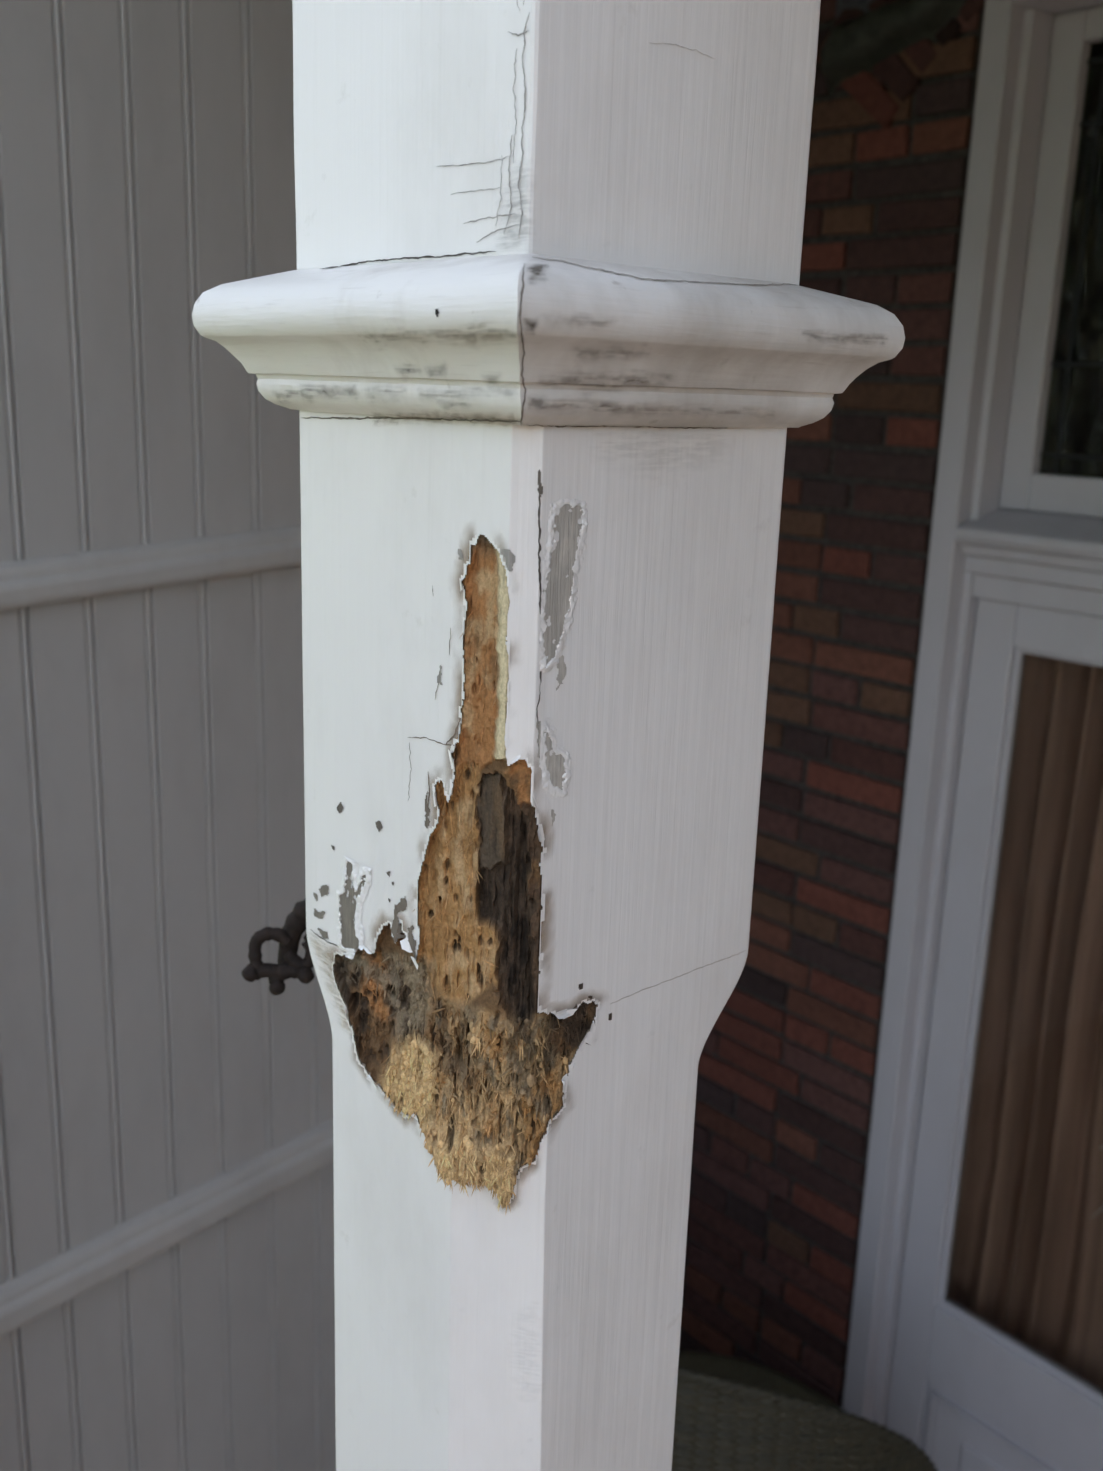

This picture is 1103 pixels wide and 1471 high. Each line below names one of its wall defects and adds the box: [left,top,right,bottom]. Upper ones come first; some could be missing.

peeling [501,549,515,571]
peeling [537,470,588,690]
peeling [425,745,455,829]
peeling [313,845,418,969]
spalling [478,717,612,1099]
crack [611,950,746,1004]